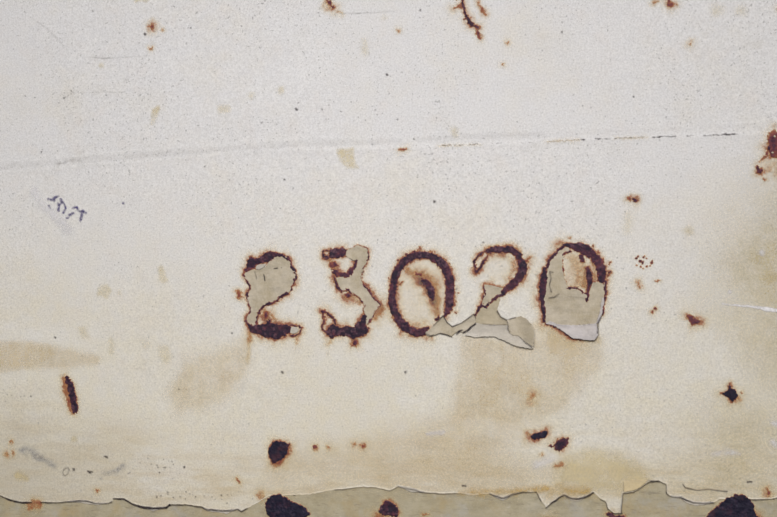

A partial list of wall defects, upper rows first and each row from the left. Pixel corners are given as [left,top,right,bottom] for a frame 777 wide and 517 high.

rust [755,130,777,181]
rust [319,244,459,347]
peeling [426,316,534,349]
peeling [546,298,604,340]
peeling [0,479,777,517]